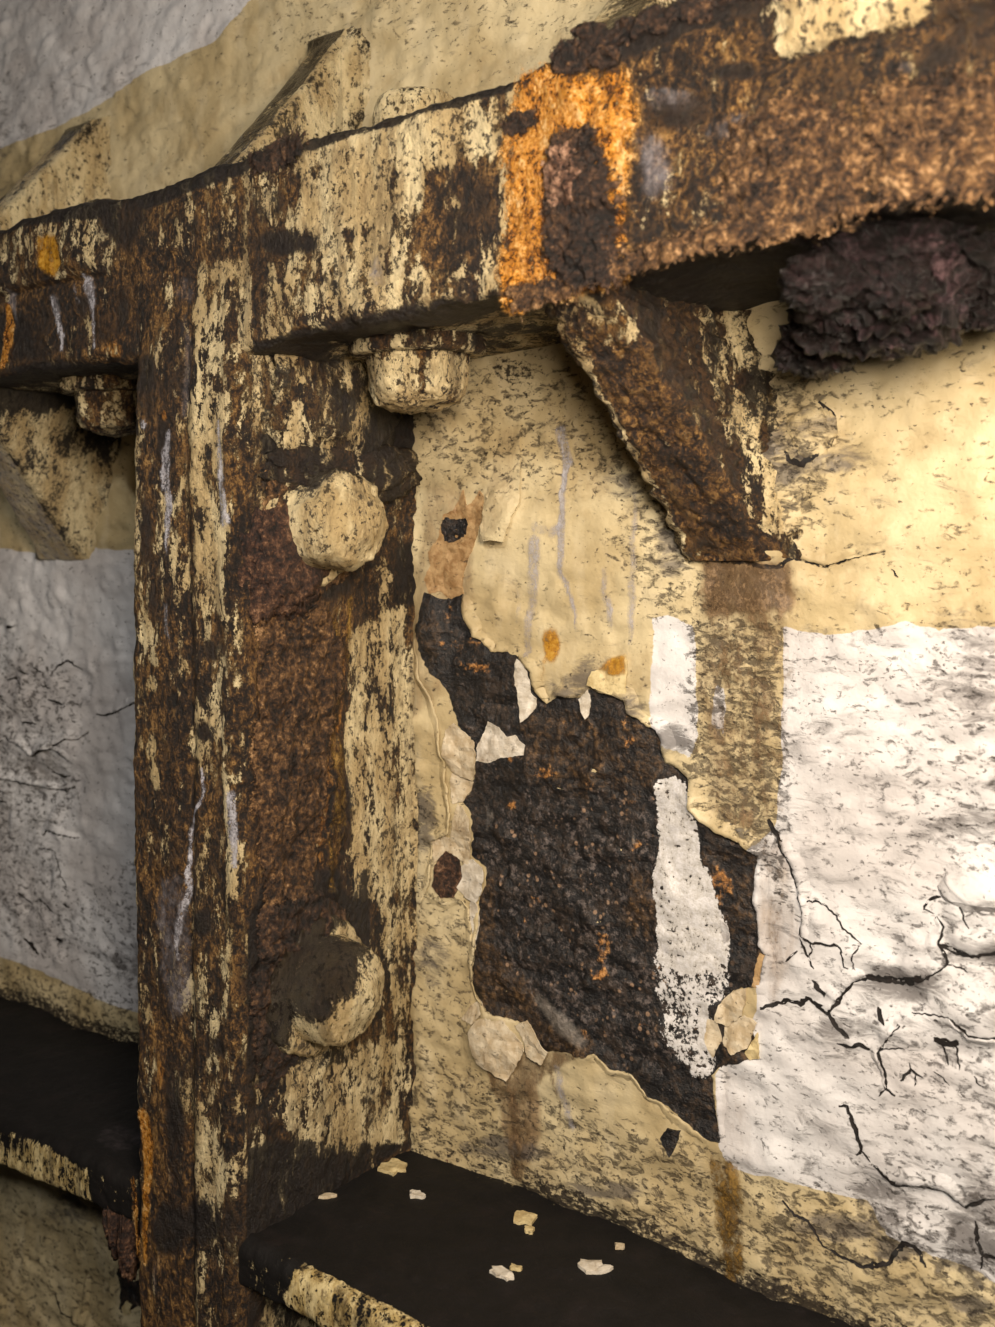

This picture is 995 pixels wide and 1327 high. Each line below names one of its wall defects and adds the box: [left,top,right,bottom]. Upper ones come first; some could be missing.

corrosion [494,0,995,317]
corrosion [261,470,289,510]
crack [96,697,135,716]
peeling [413,423,776,1157]
corrosion [247,571,352,1093]
crack [17,848,67,912]
crack [760,819,995,1097]
crack [838,1104,995,1270]
crack [782,1200,927,1270]
peeling [114,1260,141,1315]
peeling [489,1263,522,1281]